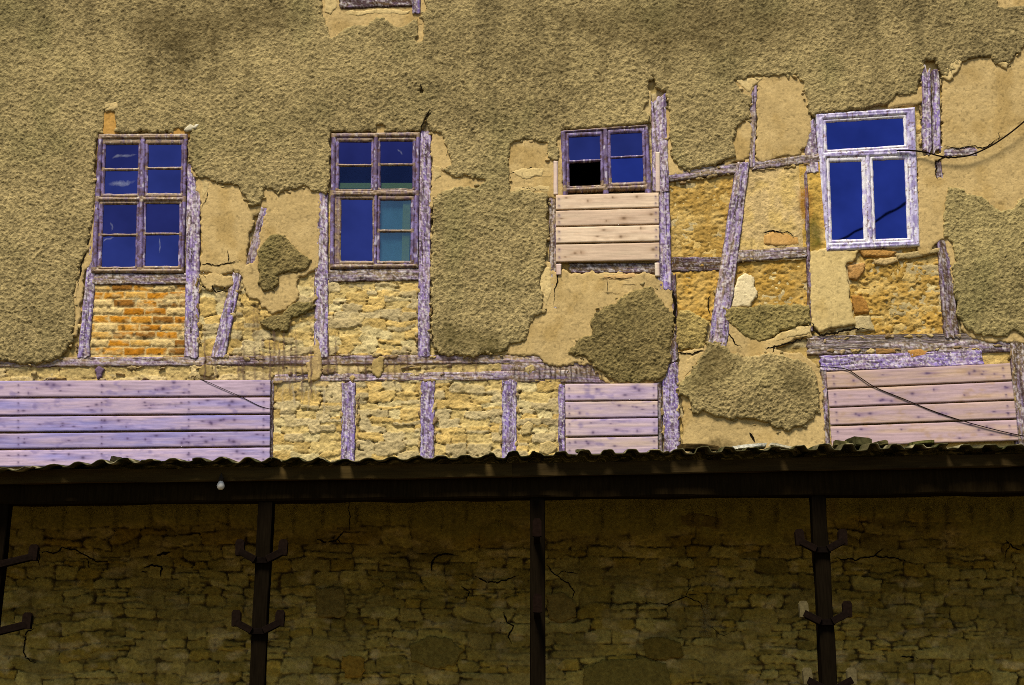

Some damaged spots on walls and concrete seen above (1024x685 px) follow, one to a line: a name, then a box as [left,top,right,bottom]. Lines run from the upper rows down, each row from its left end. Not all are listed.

spalling [322,0,427,42]
spalling [429,131,485,210]
spalling [73,204,95,337]
spalling [191,167,321,315]
spalling [493,47,1024,453]
crack [38,547,107,567]
crack [142,552,170,577]
crack [431,553,457,571]
crack [461,575,519,602]
crack [547,565,577,598]
crack [834,550,917,565]
crack [644,584,733,636]